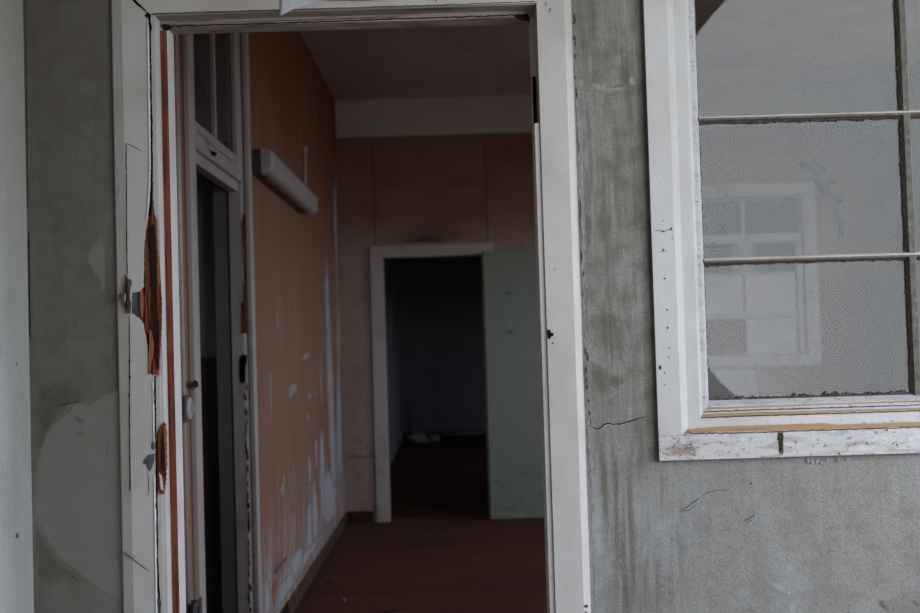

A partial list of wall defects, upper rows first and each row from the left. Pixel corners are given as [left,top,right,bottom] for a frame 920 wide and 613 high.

peeling [264,180,343,613]
crack [588,417,643,431]